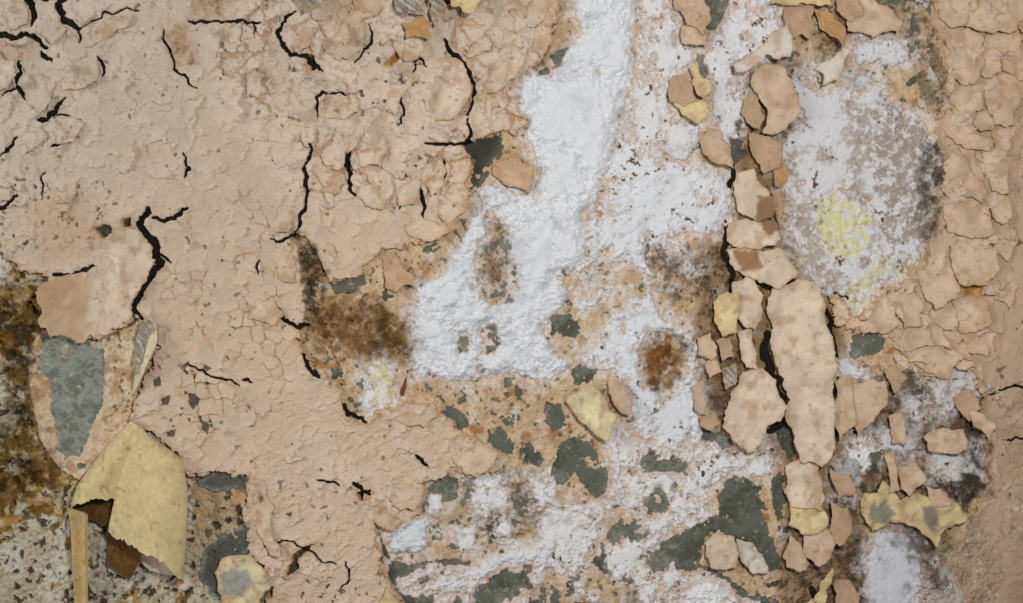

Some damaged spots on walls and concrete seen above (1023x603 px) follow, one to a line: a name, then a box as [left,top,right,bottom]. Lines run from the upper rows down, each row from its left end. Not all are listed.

leakage [0,251,53,493]
crack [0,0,139,147]
crack [131,206,189,320]
crack [188,11,347,118]
crack [255,143,313,275]
crack [279,308,320,379]
crack [344,151,356,196]
peeling [0,0,798,603]
crack [398,38,477,218]
leakage [295,0,780,603]
peeling [638,0,1023,603]
leakage [778,38,945,315]